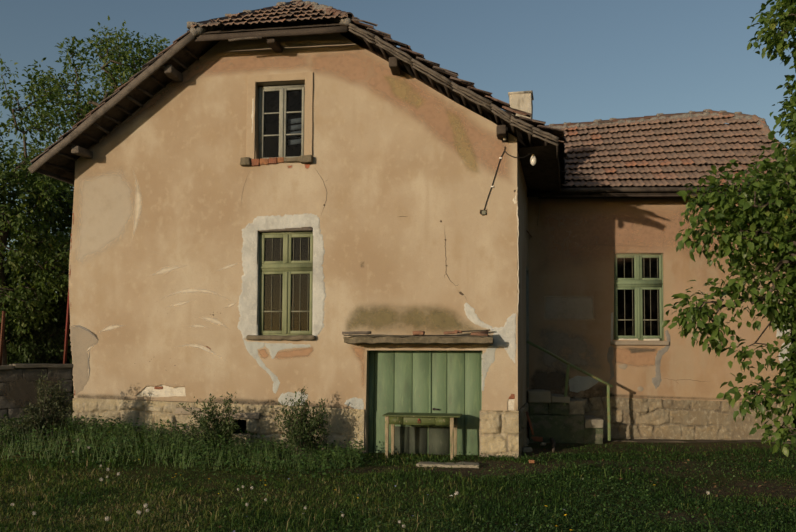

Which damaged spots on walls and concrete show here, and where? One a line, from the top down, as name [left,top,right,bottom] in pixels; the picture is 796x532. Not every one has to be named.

flaking render [120,383,186,397]